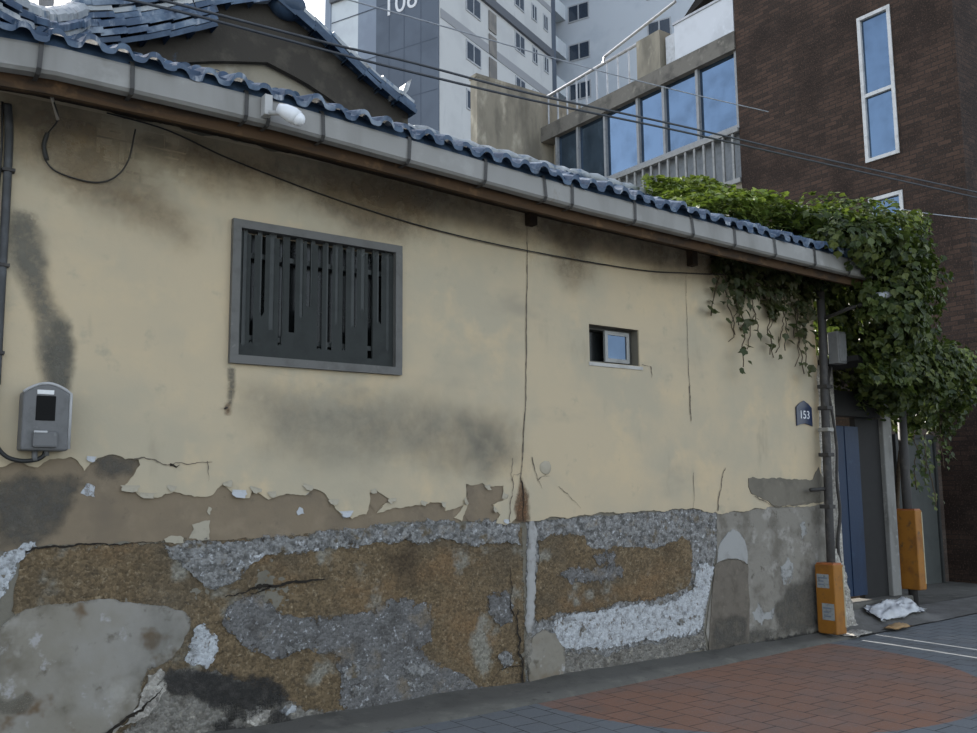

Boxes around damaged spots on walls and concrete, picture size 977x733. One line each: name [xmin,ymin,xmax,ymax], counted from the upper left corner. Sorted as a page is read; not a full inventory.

leakage [12,214,70,387]
crack [509,234,528,522]
crack [134,457,209,475]
corrosion [515,483,529,522]
spalling [0,454,827,733]